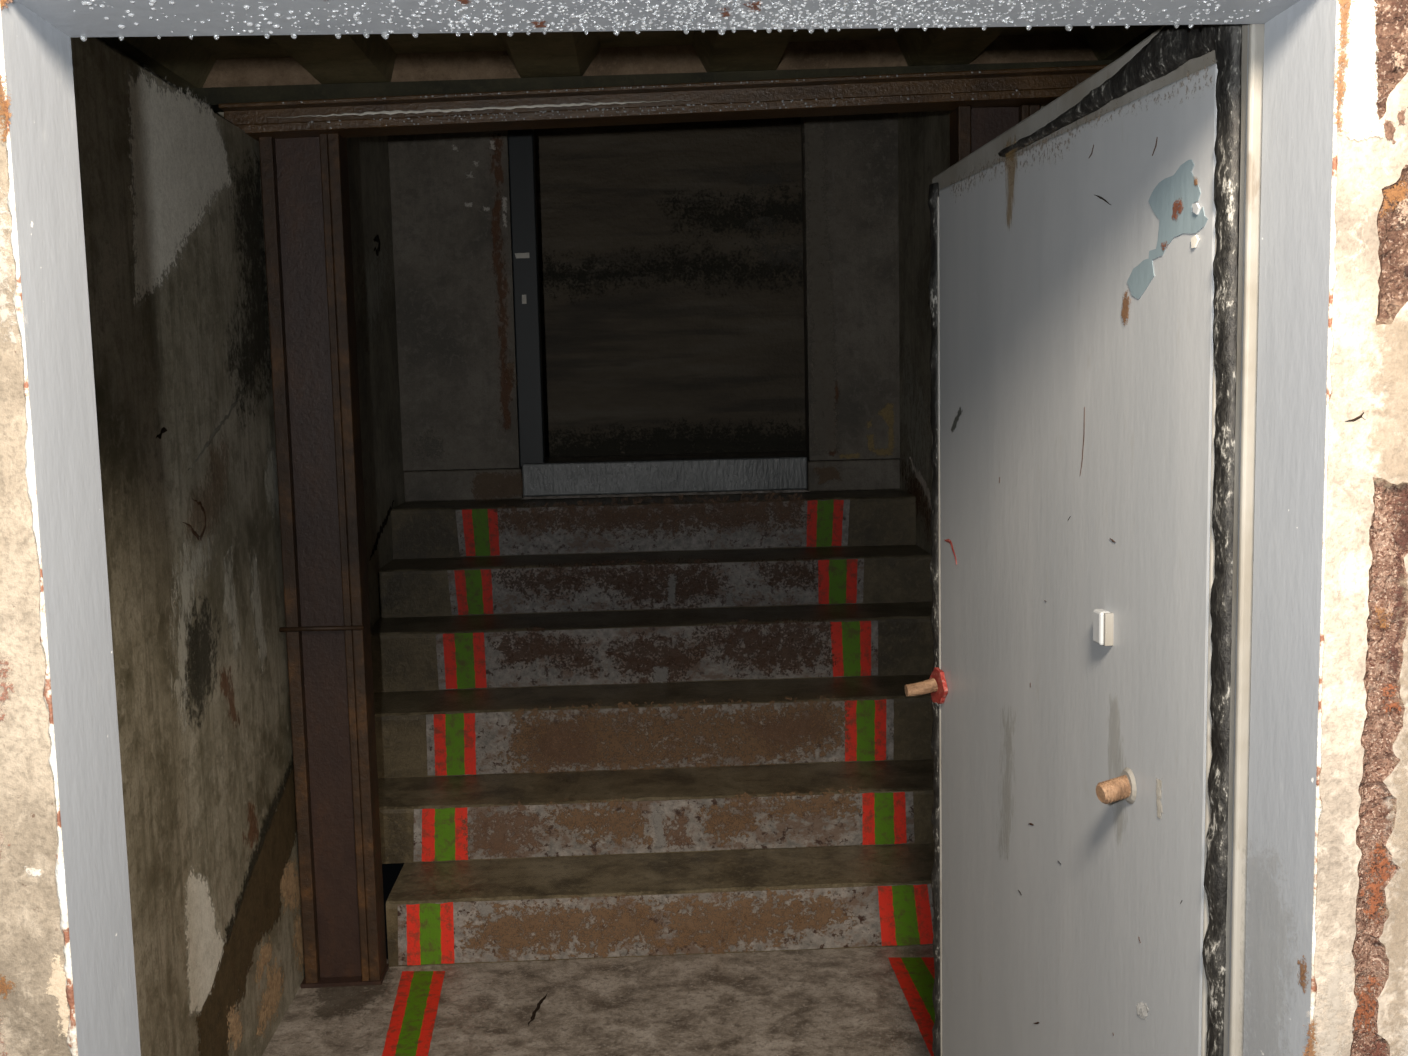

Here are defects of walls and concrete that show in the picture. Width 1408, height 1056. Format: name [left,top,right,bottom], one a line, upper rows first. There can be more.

spalling [1374,0,1408,144]
peeling [465,197,508,228]
rust [1005,141,1017,225]
peeling [1121,159,1208,325]
spalling [1375,165,1408,326]
spalling [1350,477,1408,1056]